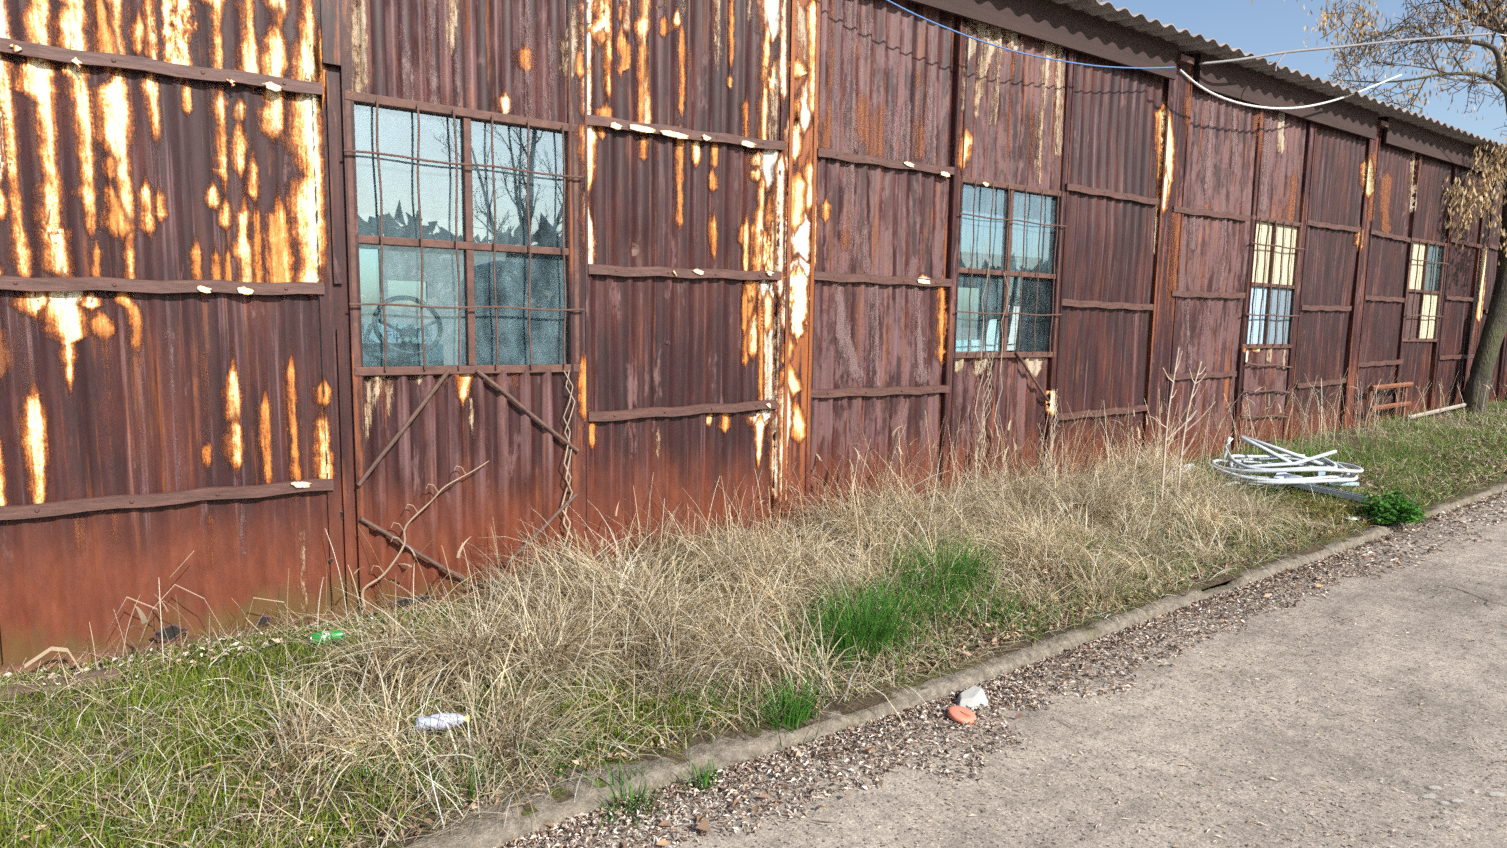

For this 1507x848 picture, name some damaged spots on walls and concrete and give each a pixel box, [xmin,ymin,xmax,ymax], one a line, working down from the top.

corrosion [87,275,144,352]
peeling [0,0,329,394]
peeling [494,0,719,264]
corrosion [673,120,686,230]
peeling [706,0,822,505]
corrosion [1032,41,1064,185]
corrosion [1154,101,1175,215]
corrosion [1476,239,1488,322]
peeling [0,379,51,506]
peeling [221,357,246,474]
corrosion [256,349,302,484]
peeling [291,378,335,491]